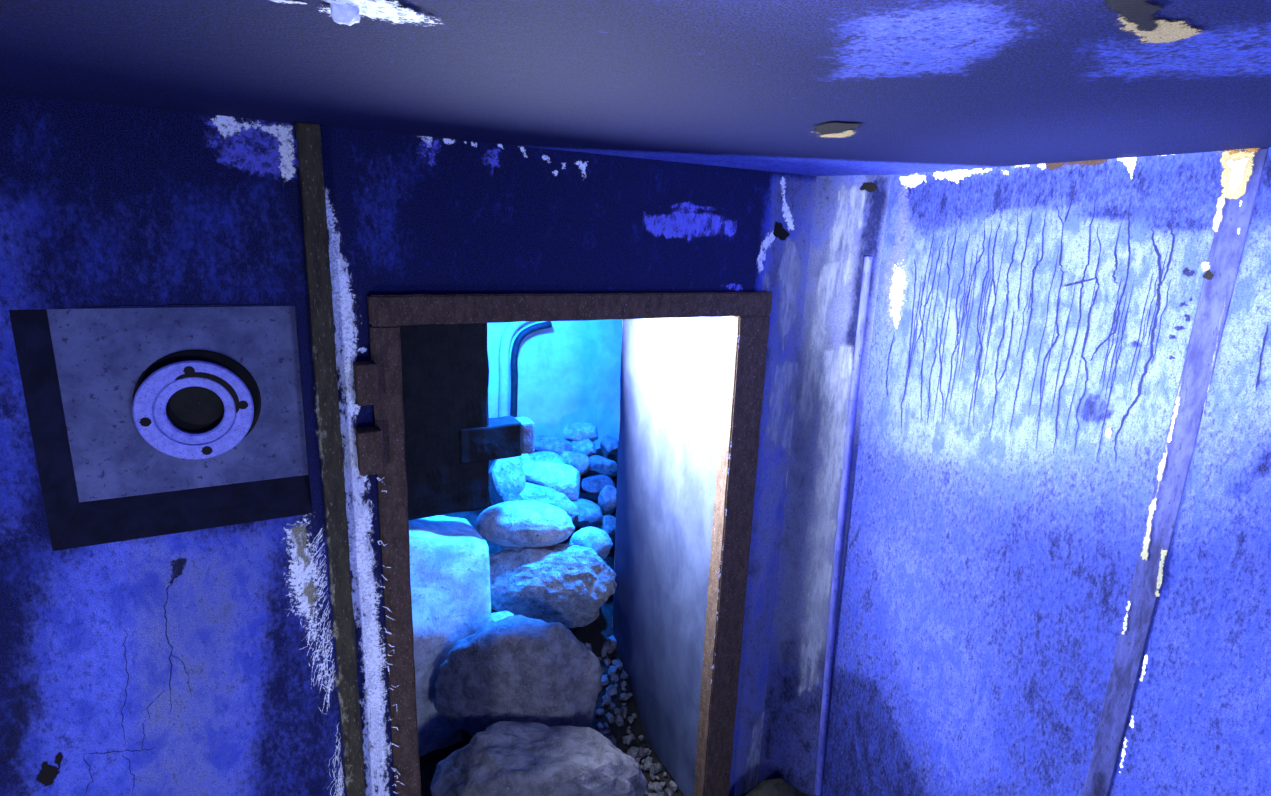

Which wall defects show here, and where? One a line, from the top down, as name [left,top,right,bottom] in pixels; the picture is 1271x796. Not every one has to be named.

spalling [1103,0,1201,43]
leakage [283,187,404,796]